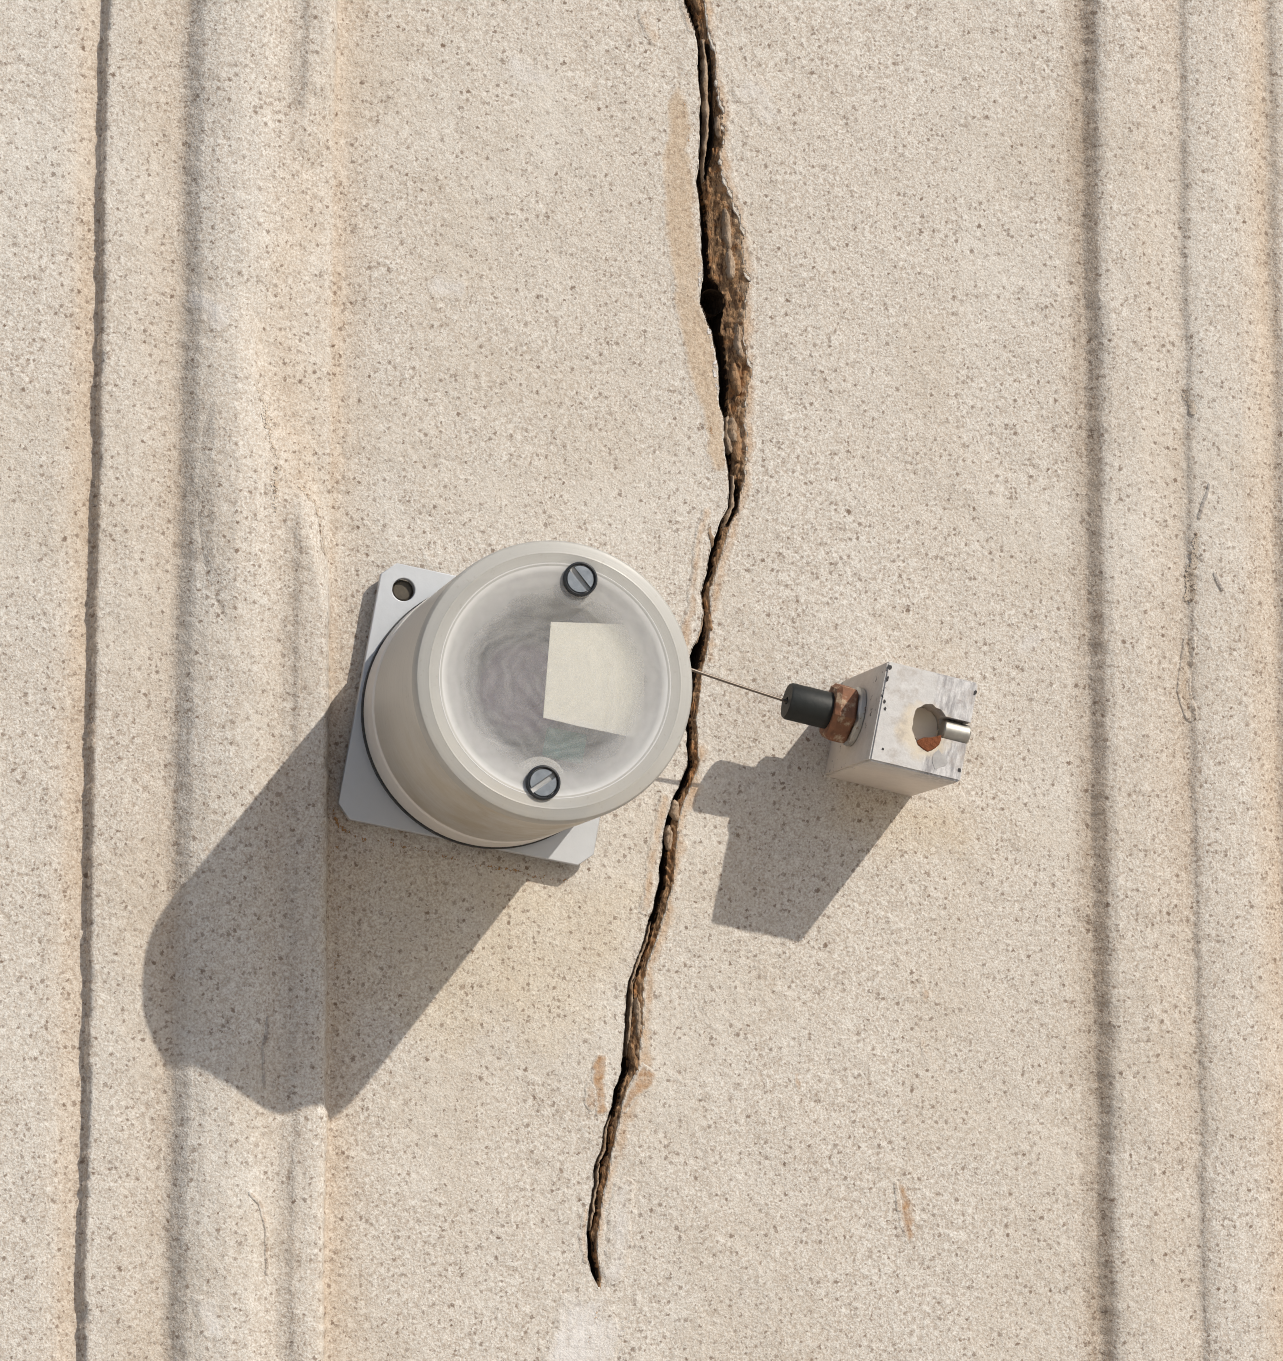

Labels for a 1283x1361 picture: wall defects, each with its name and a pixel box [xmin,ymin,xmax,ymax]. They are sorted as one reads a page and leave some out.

crack [586,0,739,1342]